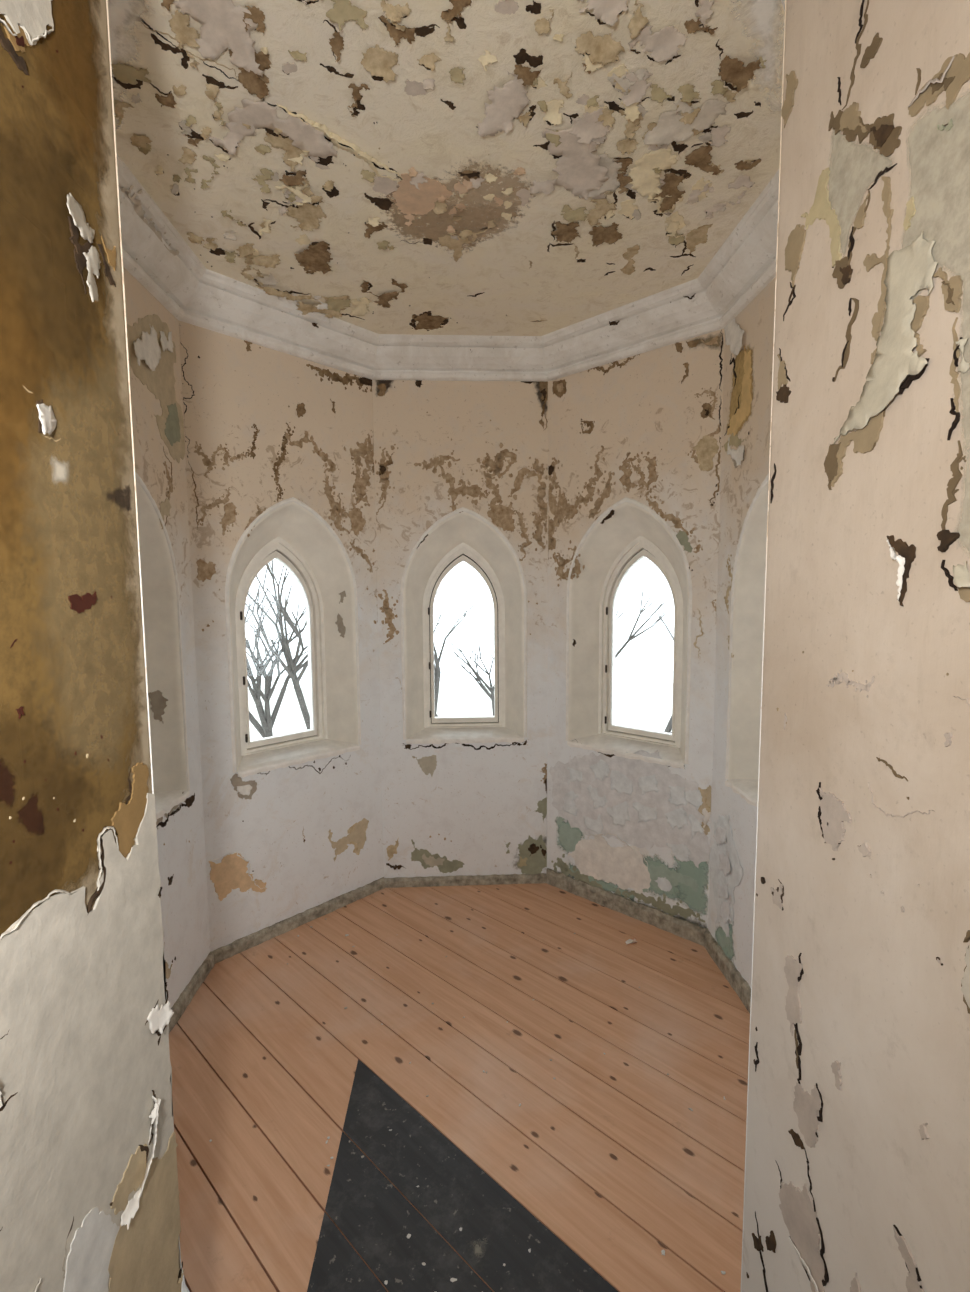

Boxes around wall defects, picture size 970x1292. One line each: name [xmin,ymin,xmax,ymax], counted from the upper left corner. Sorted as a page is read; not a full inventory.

peeling [111,0,472,328]
damp [386,163,535,262]
peeling [433,0,767,276]
peeling [784,168,970,606]
damp [0,0,145,936]
peeling [414,437,703,587]
peeling [0,762,195,1292]
crack [752,1027,760,1072]
crack [831,1060,843,1090]
crack [746,1211,777,1292]
crack [850,1273,861,1292]
crack [893,1225,925,1292]